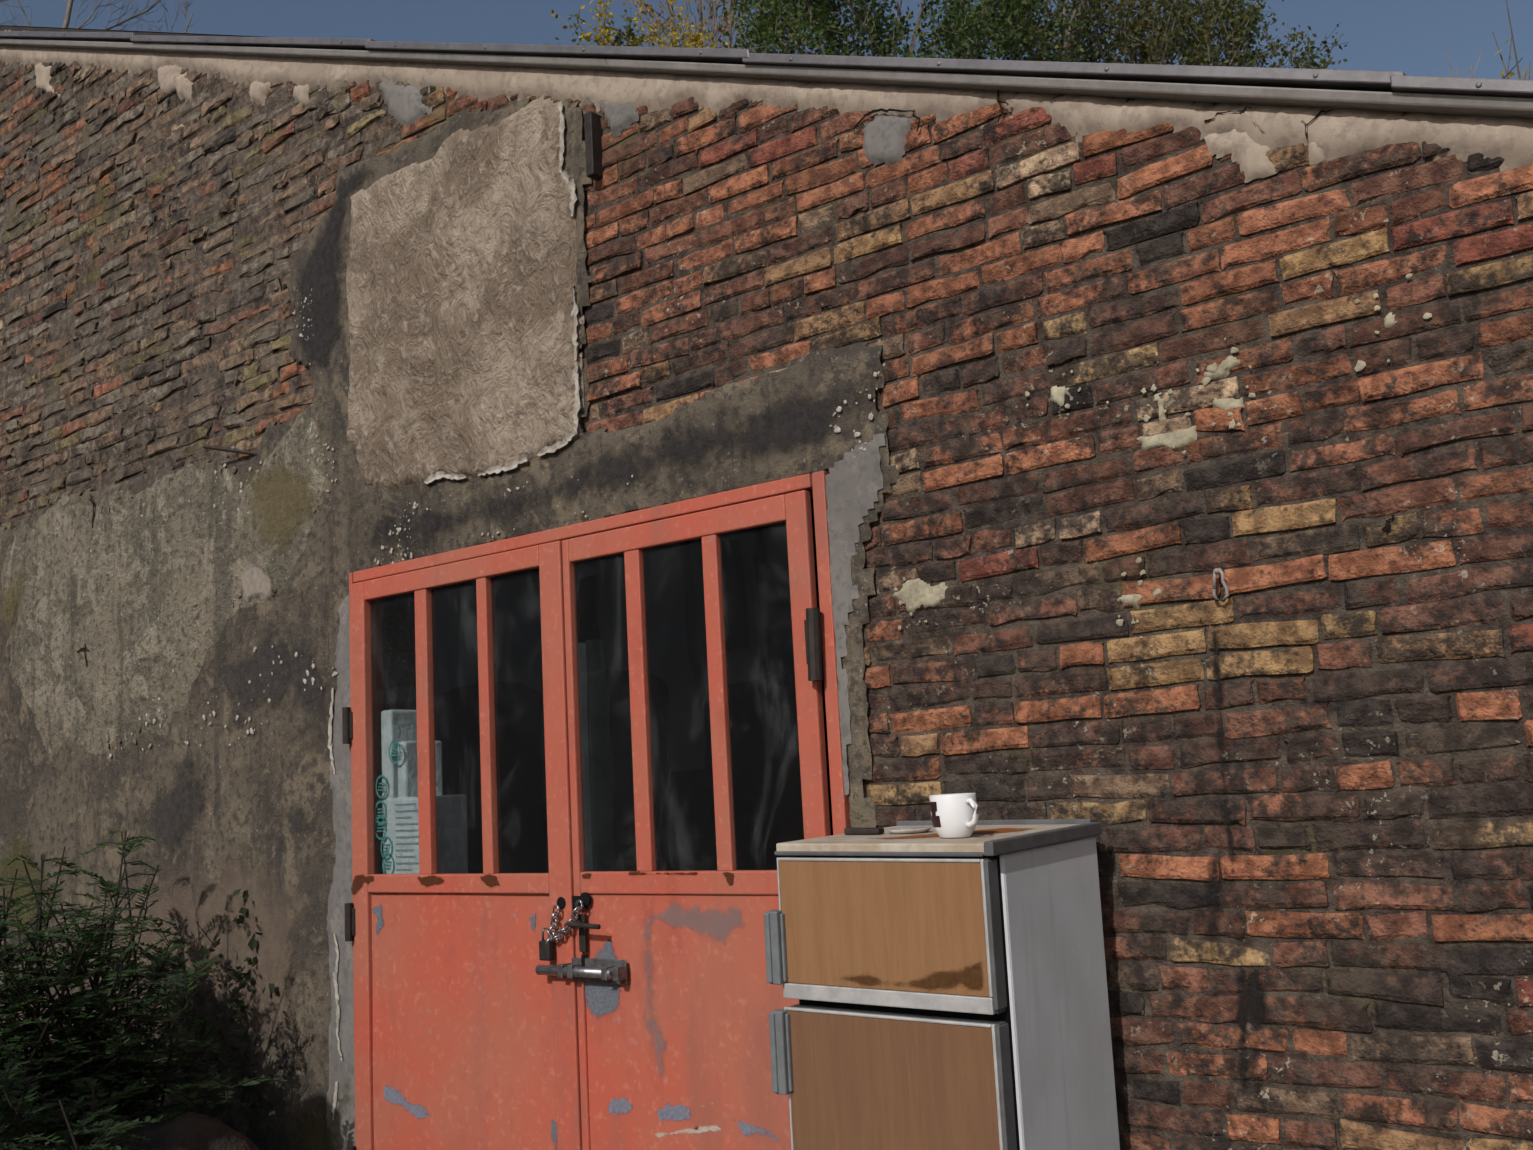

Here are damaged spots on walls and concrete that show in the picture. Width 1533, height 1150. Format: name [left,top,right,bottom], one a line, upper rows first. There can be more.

spalling [35,62,61,98]
spalling [157,65,193,102]
spalling [249,81,271,107]
spalling [293,84,311,105]
flaking render [380,80,432,125]
flaking render [557,101,577,216]
flaking render [862,113,913,166]
flaking render [1204,129,1277,183]
flaking render [1308,142,1326,166]
flaking render [374,282,580,565]
water stain [372,393,839,544]
peeling [644,905,741,980]